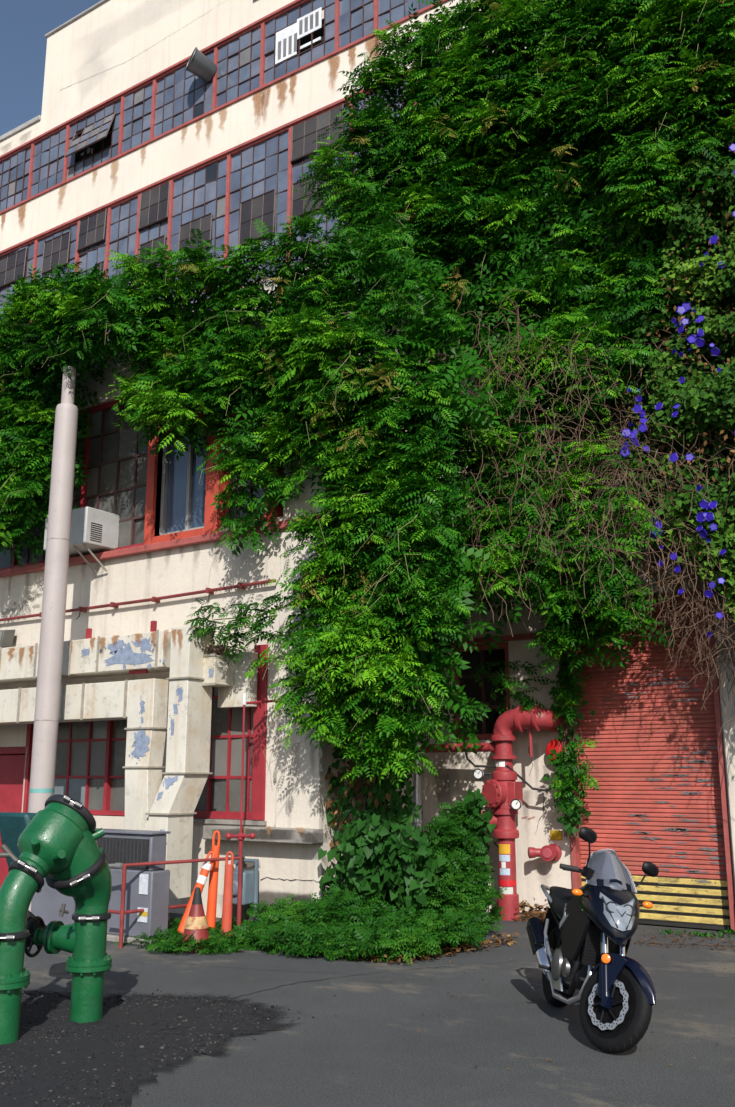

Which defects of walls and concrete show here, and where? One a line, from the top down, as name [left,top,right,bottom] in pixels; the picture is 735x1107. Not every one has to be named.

corrosion [329,36,383,78]
corrosion [253,75,296,114]
corrosion [8,646,33,663]
peeling [81,635,165,669]
corrosion [136,629,182,648]
peeling [129,697,150,764]
peeling [157,775,178,800]